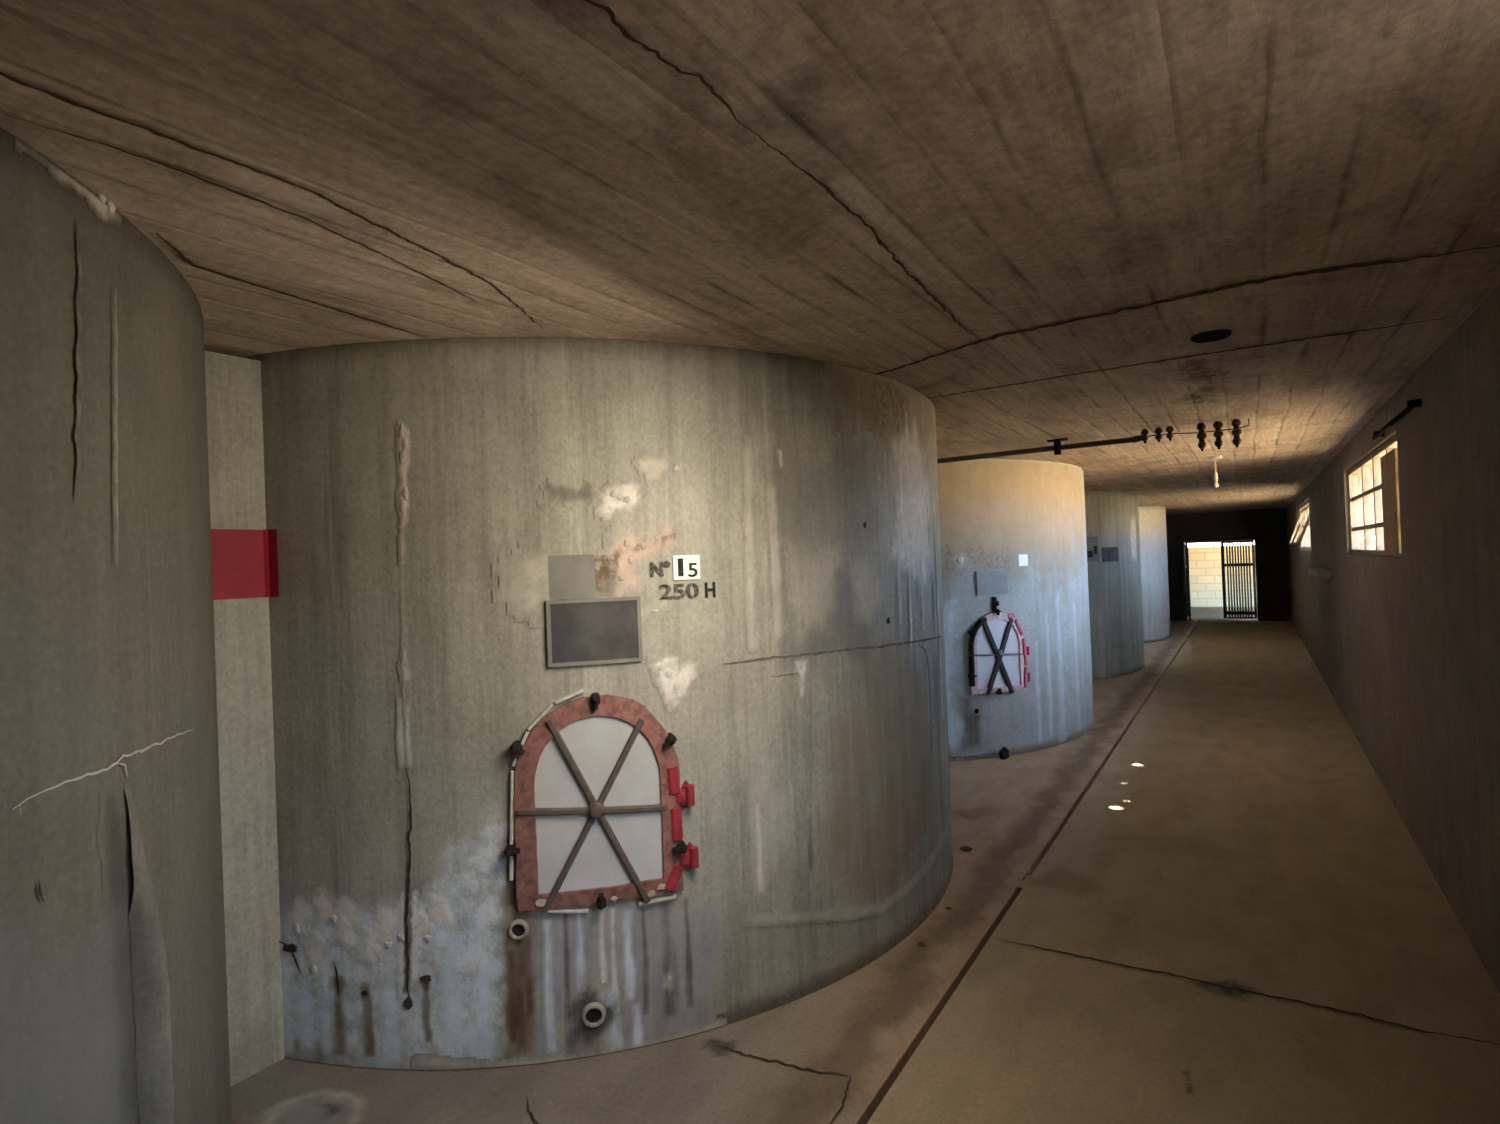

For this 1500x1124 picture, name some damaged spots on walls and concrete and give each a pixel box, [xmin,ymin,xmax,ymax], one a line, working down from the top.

crack [584,0,1500,398]
damp [279,362,1116,1070]
crack [13,729,193,812]
rust [327,971,380,1062]
rust [417,973,436,1044]
crack [992,937,1500,1045]
damp [250,1083,375,1124]
crack [695,1033,851,1123]